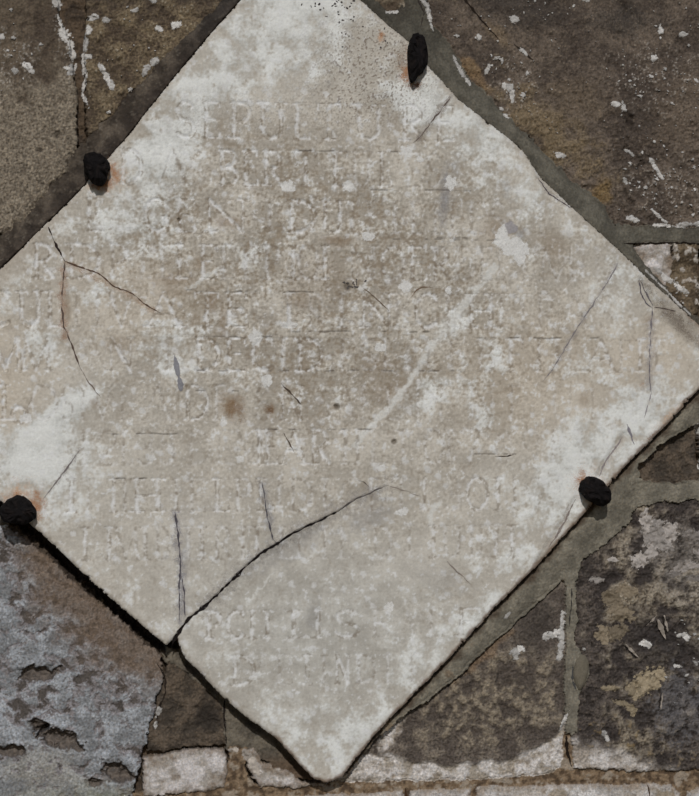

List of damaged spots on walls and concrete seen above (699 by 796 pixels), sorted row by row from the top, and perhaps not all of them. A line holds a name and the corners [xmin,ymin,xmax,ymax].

rust [86,153,132,199]
crack [624,239,699,247]
crack [48,227,160,398]
crack [543,263,620,381]
crack [639,279,674,418]
rust [0,477,54,524]
crack [168,472,421,647]
crack [156,664,167,719]